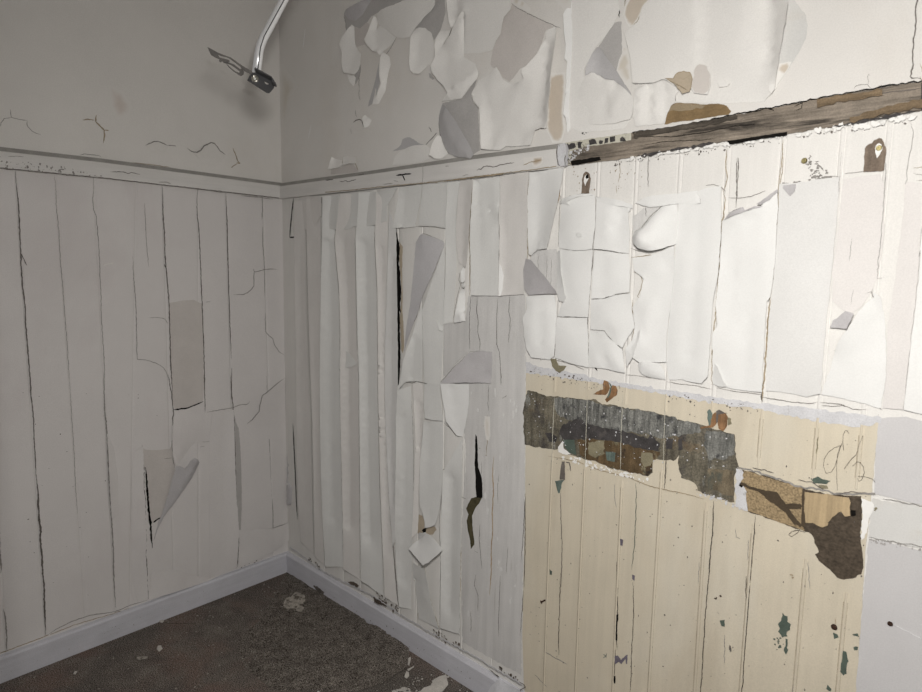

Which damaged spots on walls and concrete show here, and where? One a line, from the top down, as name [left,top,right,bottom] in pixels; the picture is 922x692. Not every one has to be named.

peeling [392,135,448,165]
peeling [339,0,788,150]
peeling [863,138,886,172]
crack [1,115,297,653]
peeling [131,300,242,602]
crack [448,426,499,499]
peeling [286,167,922,634]
crack [474,497,526,633]